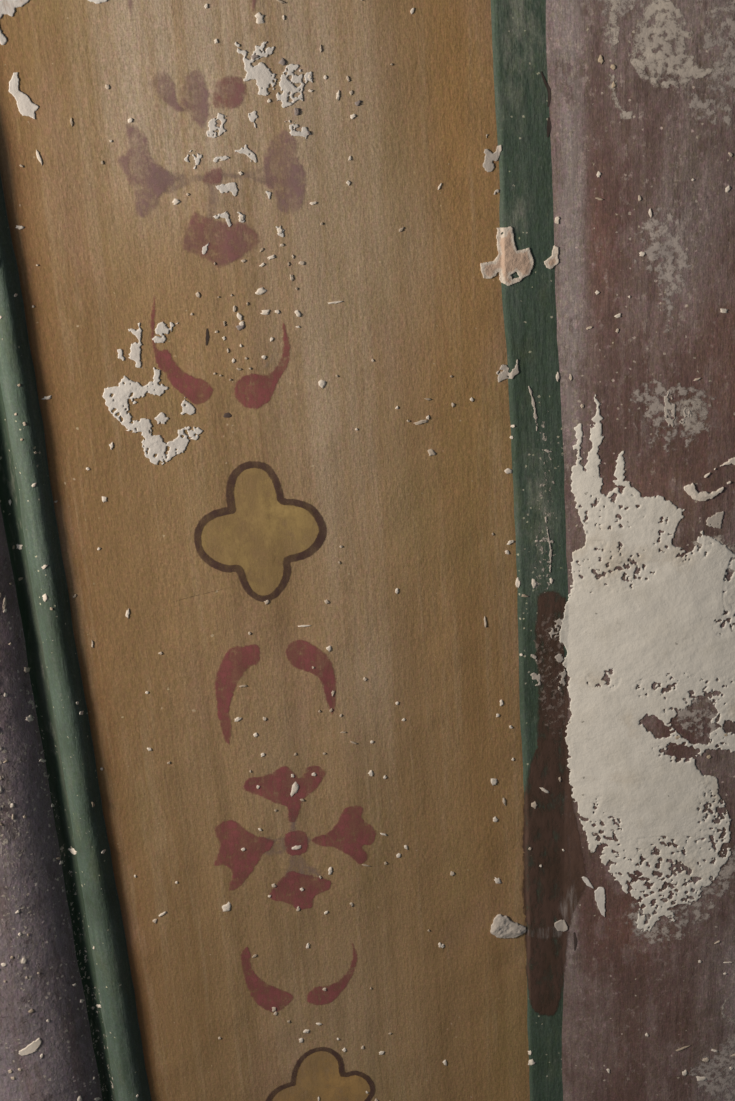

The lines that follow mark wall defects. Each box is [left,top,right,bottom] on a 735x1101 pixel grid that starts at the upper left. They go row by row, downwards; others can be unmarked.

peeling [0,0,29,45]
peeling [235,41,327,138]
peeling [206,113,226,138]
peeling [184,144,257,169]
peeling [216,171,243,196]
peeling [213,211,245,227]
spalling [480,226,559,286]
peeling [213,287,267,381]
spalling [496,359,519,382]
peeling [102,322,203,465]
peeling [515,386,735,1016]
peeling [8,1038,43,1080]